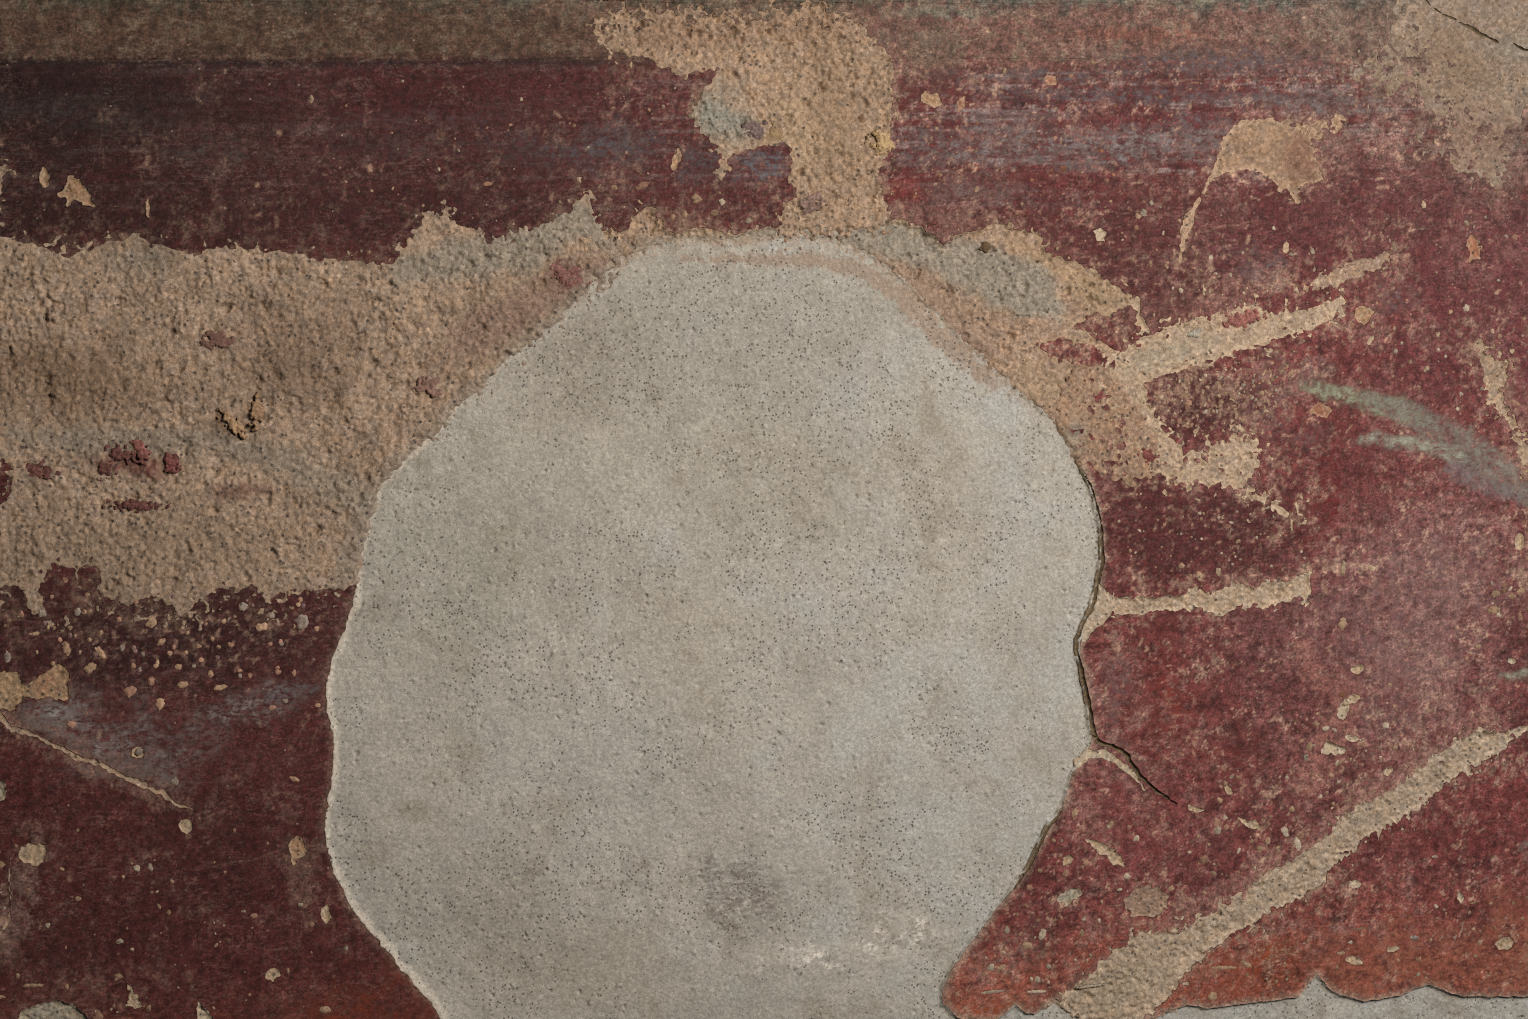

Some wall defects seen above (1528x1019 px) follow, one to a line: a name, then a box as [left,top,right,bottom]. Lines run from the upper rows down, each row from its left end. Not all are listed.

crack [1424,0,1528,51]
spalling [0,0,1528,642]
crack [1073,460,1177,804]
spalling [1350,664,1364,674]
spalling [981,683,1528,1019]
spalling [16,973,151,1019]
spalling [197,1000,215,1019]